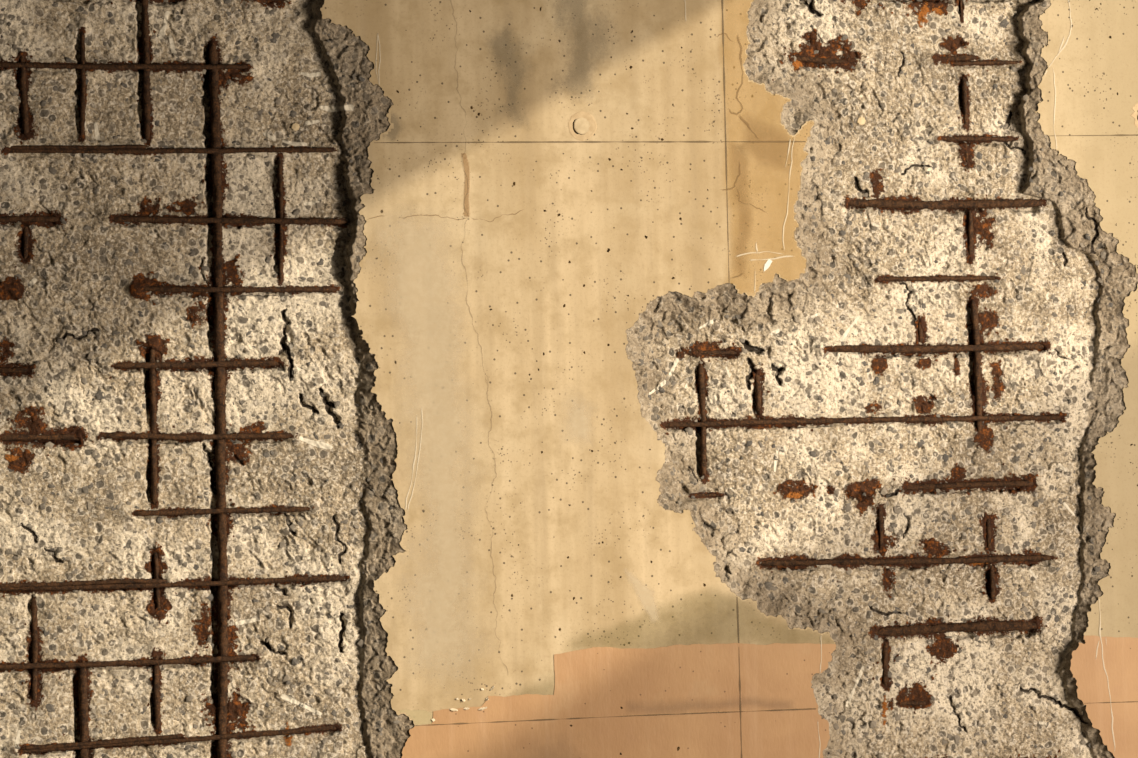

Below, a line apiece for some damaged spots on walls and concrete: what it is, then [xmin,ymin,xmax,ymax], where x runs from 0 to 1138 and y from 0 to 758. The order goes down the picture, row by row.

corrosion [852,0,978,28]
corrosion [777,28,876,78]
corrosion [938,33,970,63]
corrosion [964,282,1004,337]
spalling [0,0,414,758]
spalling [625,0,1138,758]
corrosion [987,352,1006,402]
corrosion [4,406,53,474]
corrosion [773,478,888,516]
corrosion [144,545,172,625]
corrosion [882,632,962,725]
corrosion [201,684,256,734]